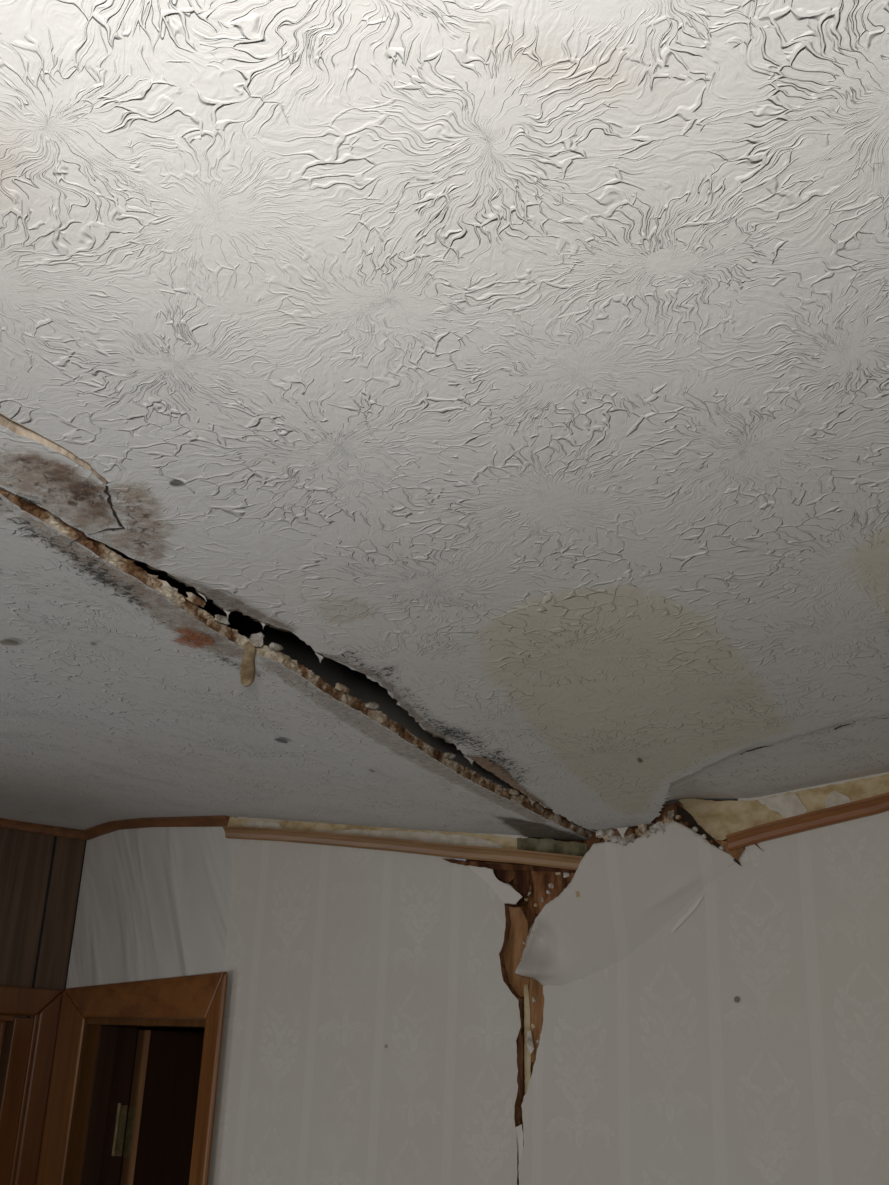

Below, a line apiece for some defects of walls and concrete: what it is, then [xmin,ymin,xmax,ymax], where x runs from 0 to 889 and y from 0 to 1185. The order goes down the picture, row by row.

damp [0,456,243,669]
rust [174,629,213,648]
crack [0,412,592,839]
damp [174,566,822,822]
damp [498,818,582,841]
crack [514,1124,524,1185]